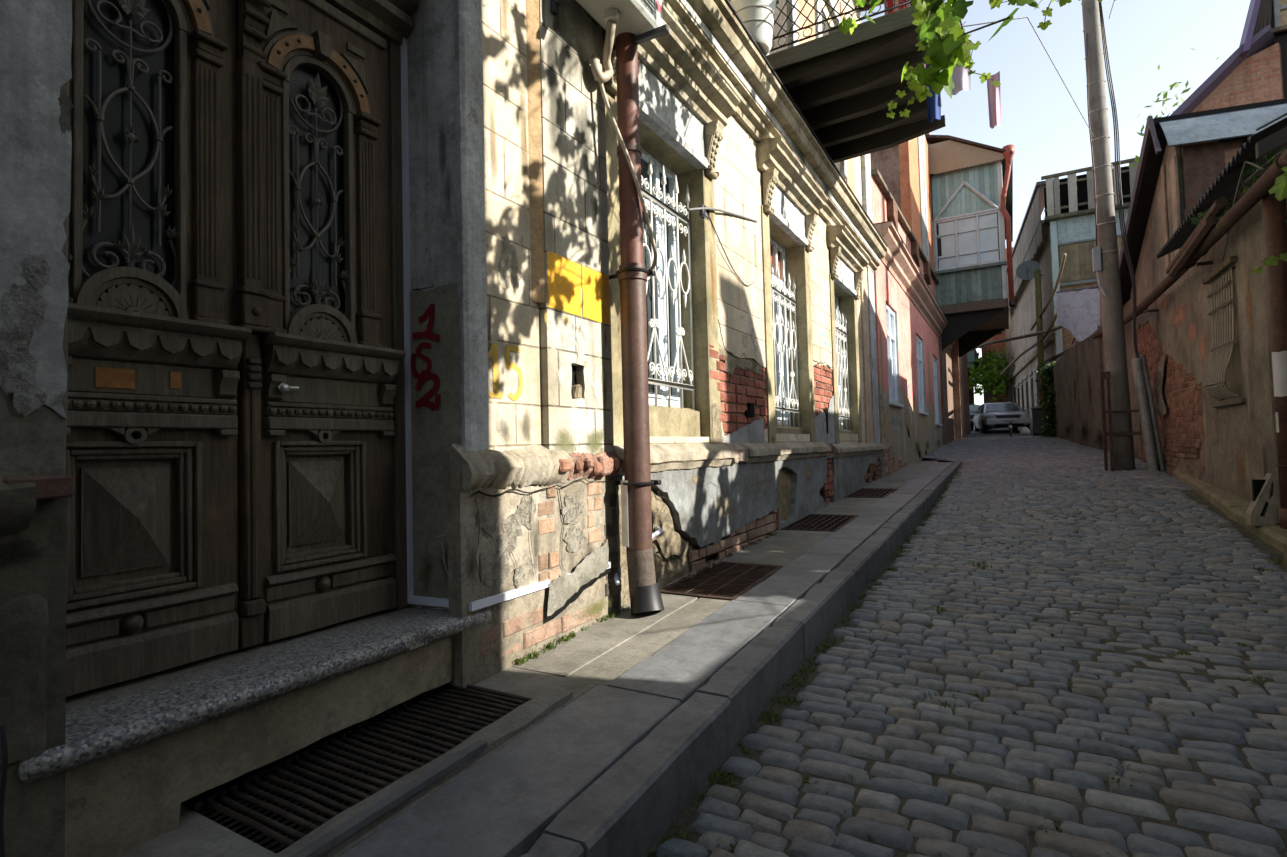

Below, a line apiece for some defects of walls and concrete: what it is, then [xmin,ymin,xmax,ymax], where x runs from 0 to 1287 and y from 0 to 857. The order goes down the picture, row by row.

spalling [0,254,51,416]
flaking render [709,330,767,436]
flaking render [813,364,834,504]
flaking render [1136,324,1212,485]
peeling [475,482,630,658]
crack [652,489,686,560]
spalling [651,468,791,588]